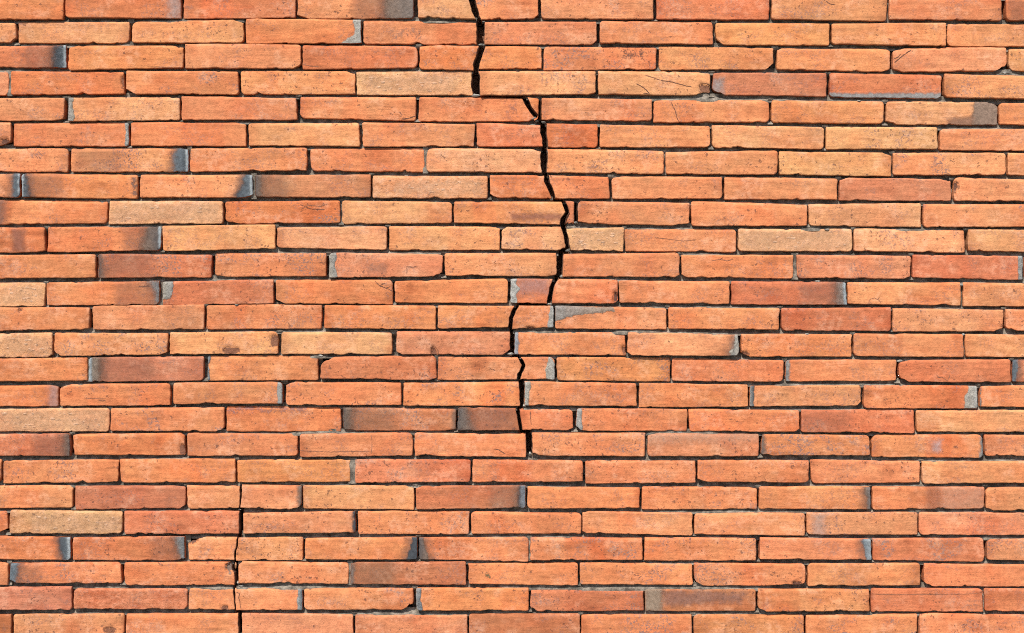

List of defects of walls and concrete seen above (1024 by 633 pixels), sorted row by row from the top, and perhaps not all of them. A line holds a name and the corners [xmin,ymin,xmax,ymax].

crack [469,0,486,98]
crack [496,95,578,456]